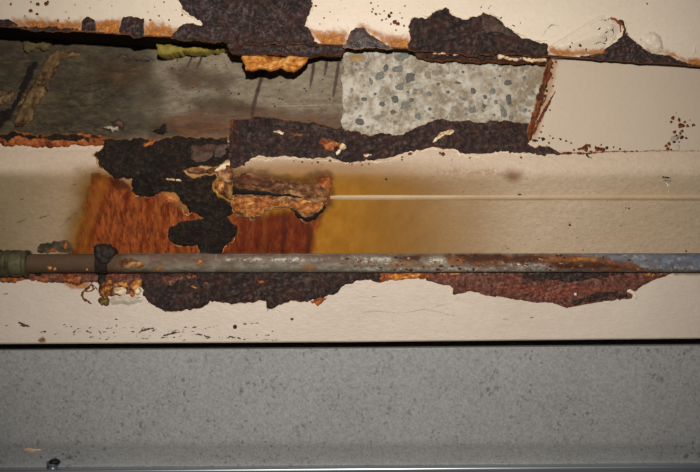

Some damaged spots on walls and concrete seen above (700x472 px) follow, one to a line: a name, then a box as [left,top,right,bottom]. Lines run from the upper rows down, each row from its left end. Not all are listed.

peeling [0,49,80,129]
spalling [341,20,700,136]
peeling [215,159,333,225]
corrosion [0,0,700,313]
peeling [98,273,142,299]